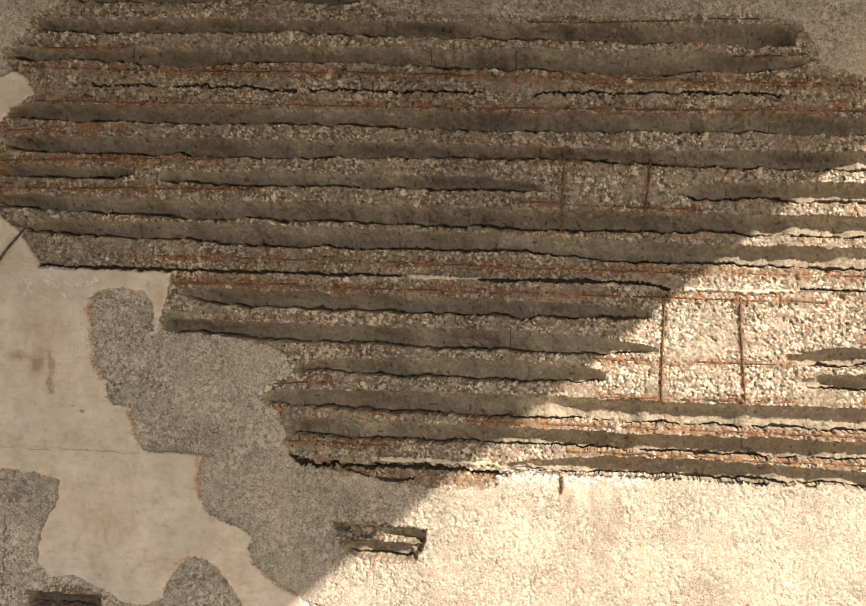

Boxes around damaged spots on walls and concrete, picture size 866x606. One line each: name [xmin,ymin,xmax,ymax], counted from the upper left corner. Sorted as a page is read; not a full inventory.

spalling [0,0,866,292]
corrosion [137,252,520,298]
corrosion [590,355,728,370]
spalling [87,270,866,606]
corrosion [570,447,644,458]
corrosion [468,413,861,442]
corrosion [658,450,864,470]
peeling [0,467,242,606]